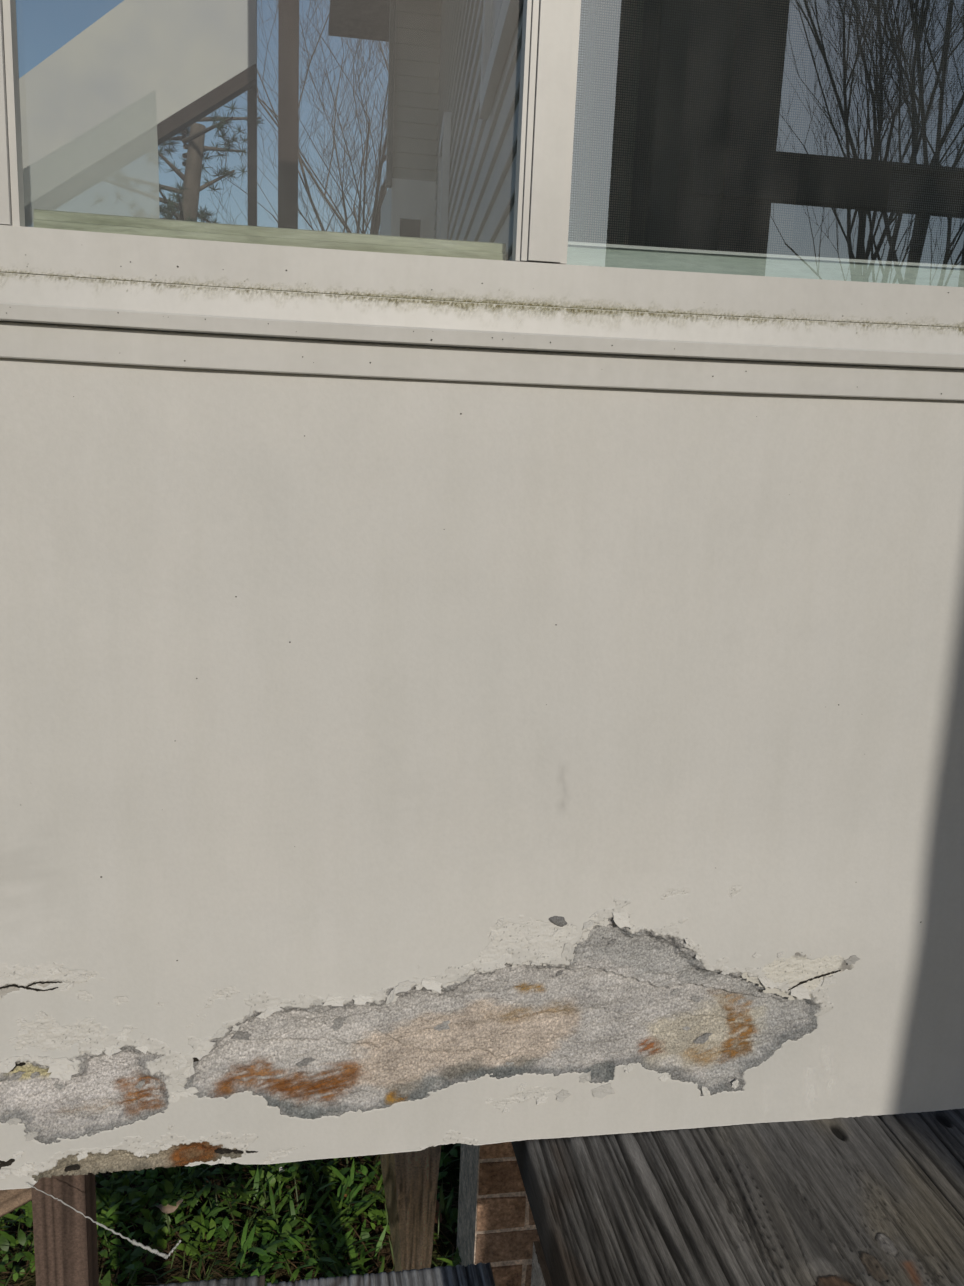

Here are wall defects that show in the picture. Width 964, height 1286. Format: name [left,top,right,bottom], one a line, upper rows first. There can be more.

crack [0,961,107,1000]
peeling [0,897,860,1181]
rust [722,1008,755,1057]
rust [118,1076,159,1113]
rust [221,1063,358,1101]
rust [173,1143,219,1165]